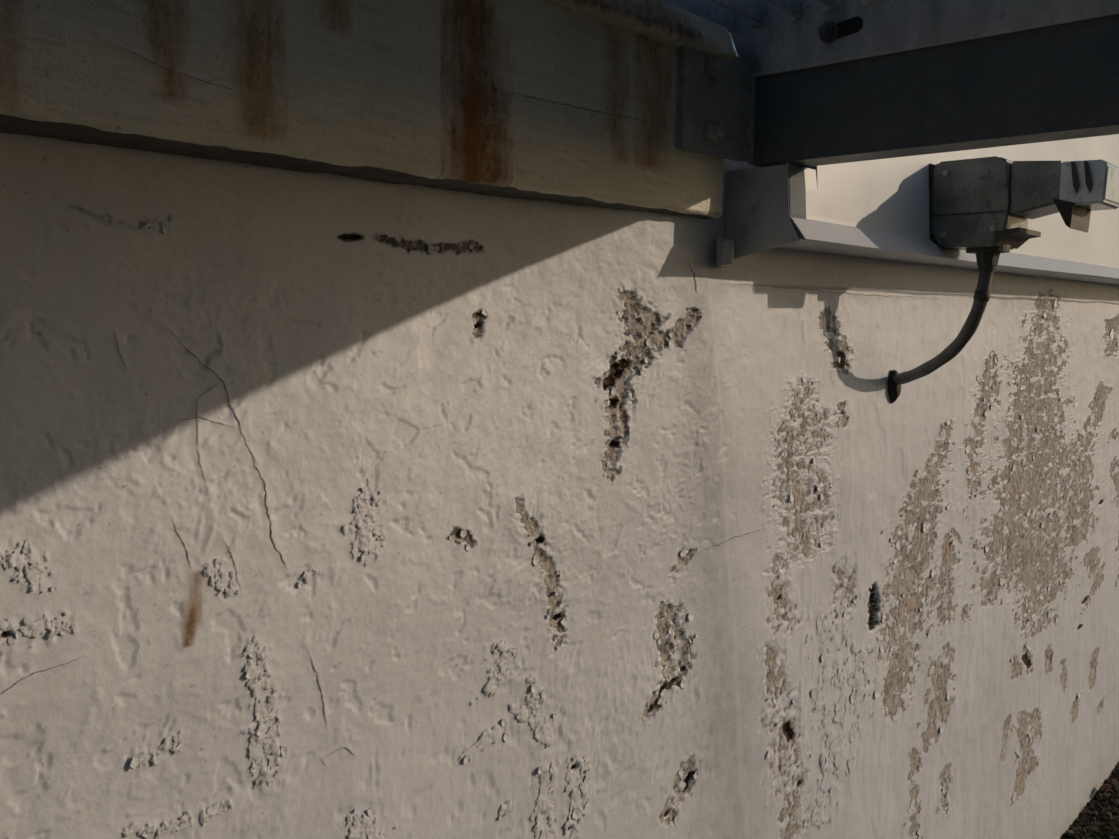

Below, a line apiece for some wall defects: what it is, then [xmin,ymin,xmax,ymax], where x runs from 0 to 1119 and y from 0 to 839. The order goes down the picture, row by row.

corrosion [445,0,507,186]
peeling [337,234,483,254]
crack [170,331,288,570]
flaking render [592,286,702,482]
flaking render [819,306,853,375]
peeling [835,400,849,428]
peeling [952,289,1119,723]
corrosion [185,606,198,646]
peeling [512,497,568,650]
flaking render [641,600,699,721]
peeling [832,565,886,630]
spalling [782,722,794,742]